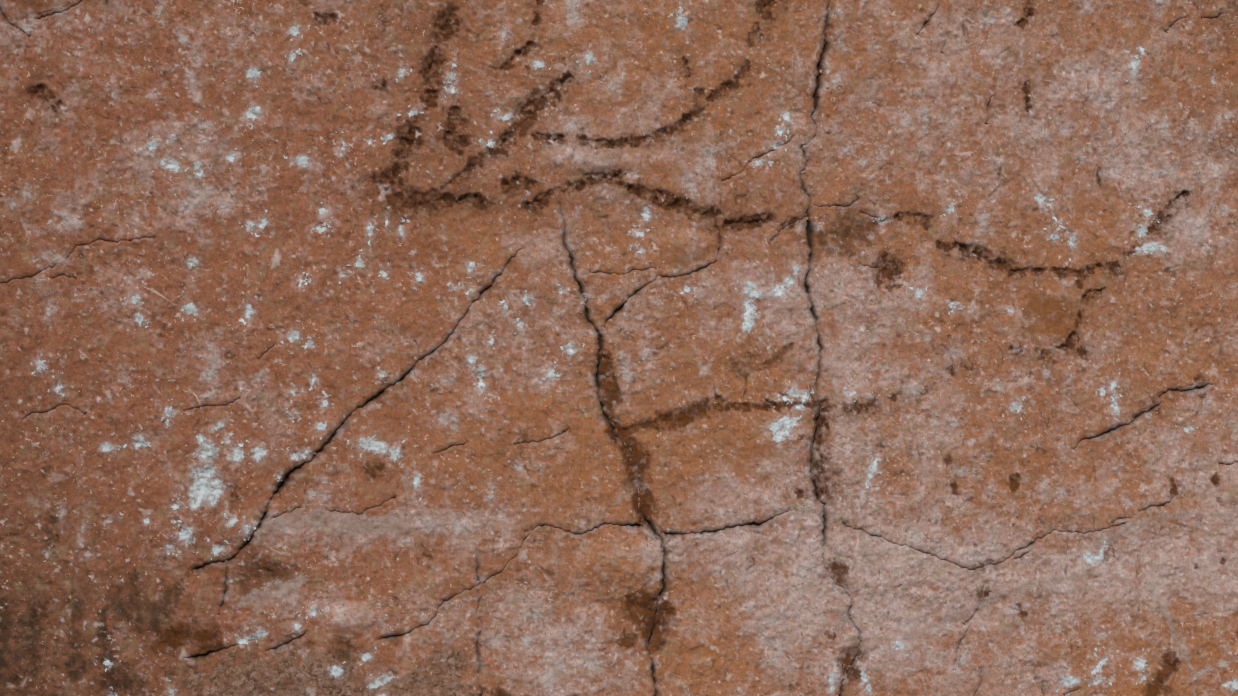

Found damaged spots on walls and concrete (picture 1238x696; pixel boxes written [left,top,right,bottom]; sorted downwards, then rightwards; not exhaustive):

crack [1164,10,1225,34]
crack [183,246,525,662]
crack [377,0,1176,696]
crack [1072,380,1214,451]